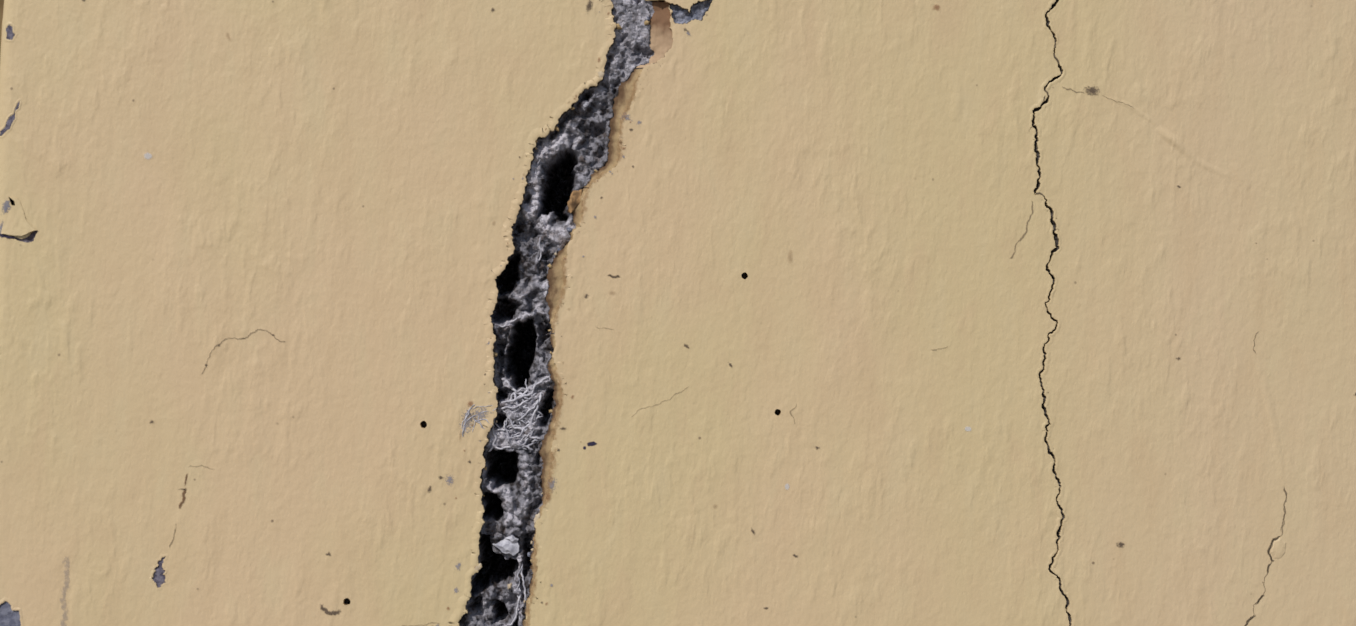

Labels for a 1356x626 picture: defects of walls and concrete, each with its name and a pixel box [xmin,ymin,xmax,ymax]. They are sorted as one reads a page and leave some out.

peeling [3,22,18,43]
peeling [0,98,22,139]
peeling [0,196,38,243]
crack [1011,0,1132,626]
spalling [459,402,497,437]
peeling [149,554,169,591]
crack [1244,490,1287,626]
peeling [0,597,24,626]